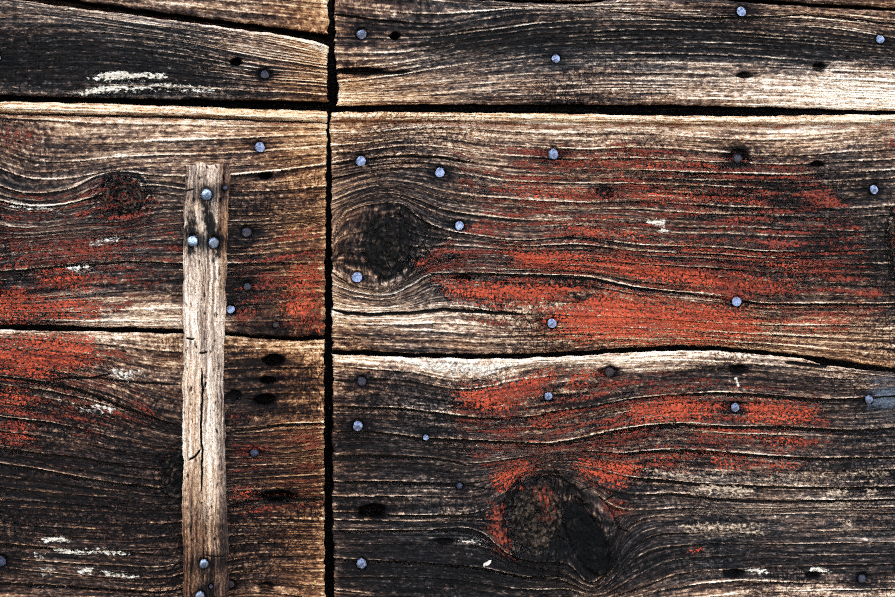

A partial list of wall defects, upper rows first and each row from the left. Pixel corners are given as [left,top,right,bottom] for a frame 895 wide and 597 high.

peeling [0,179,183,448]
peeling [235,220,326,332]
peeling [413,142,885,351]
crack [0,337,208,491]
peeling [232,463,323,516]